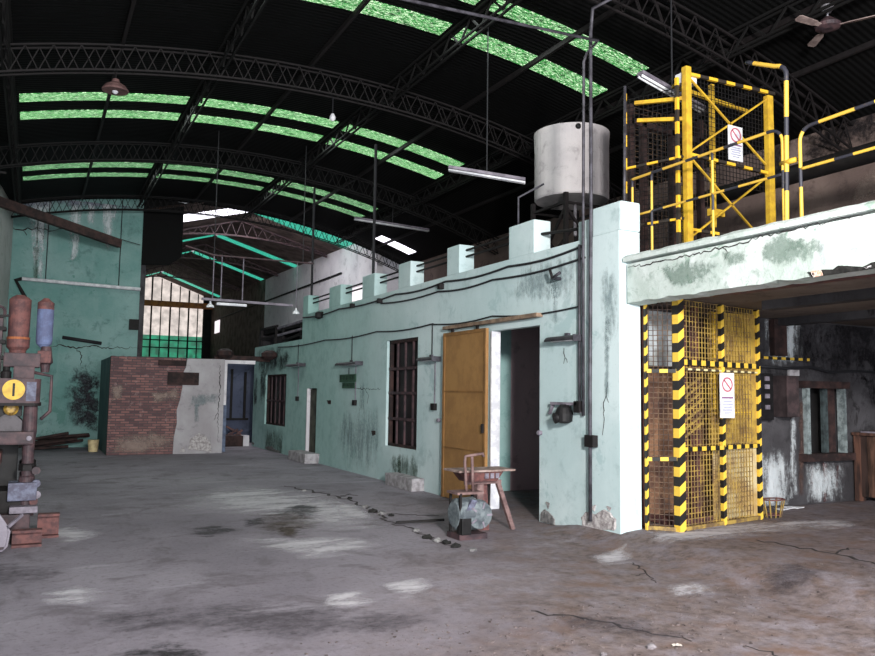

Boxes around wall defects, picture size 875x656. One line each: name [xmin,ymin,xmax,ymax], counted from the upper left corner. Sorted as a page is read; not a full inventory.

leakage [762,403,804,505]
spalling [581,505,617,531]
crack [757,540,875,564]